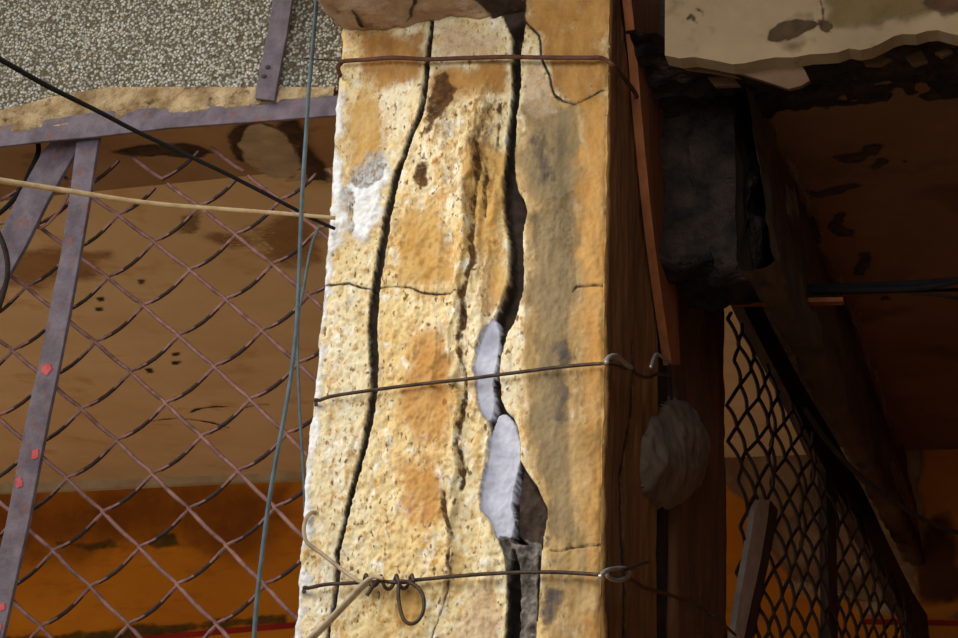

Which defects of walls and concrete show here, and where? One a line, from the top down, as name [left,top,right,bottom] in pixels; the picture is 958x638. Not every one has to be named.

crack [326,0,456,638]
crack [491,23,604,545]
peeling [768,19,832,42]
water stain [915,518,958,604]